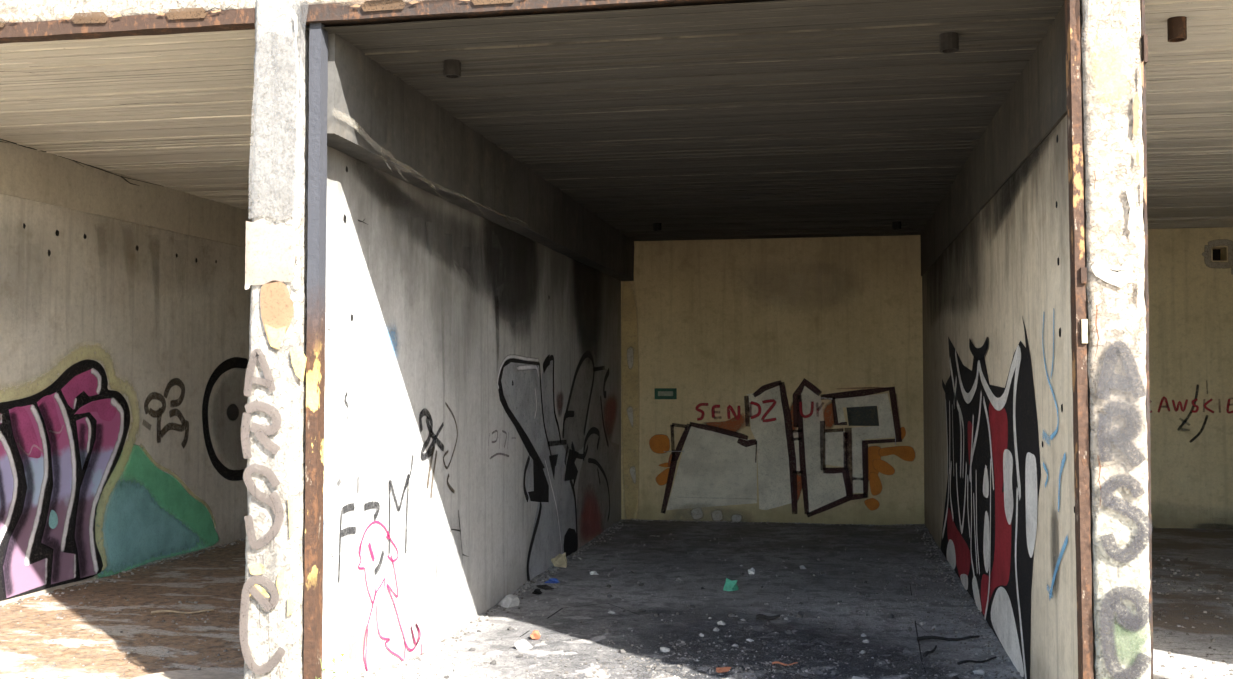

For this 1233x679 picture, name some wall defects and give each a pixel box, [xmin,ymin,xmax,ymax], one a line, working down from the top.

peeling [245,221,307,381]
peeling [324,314,339,558]
peeling [249,563,295,616]